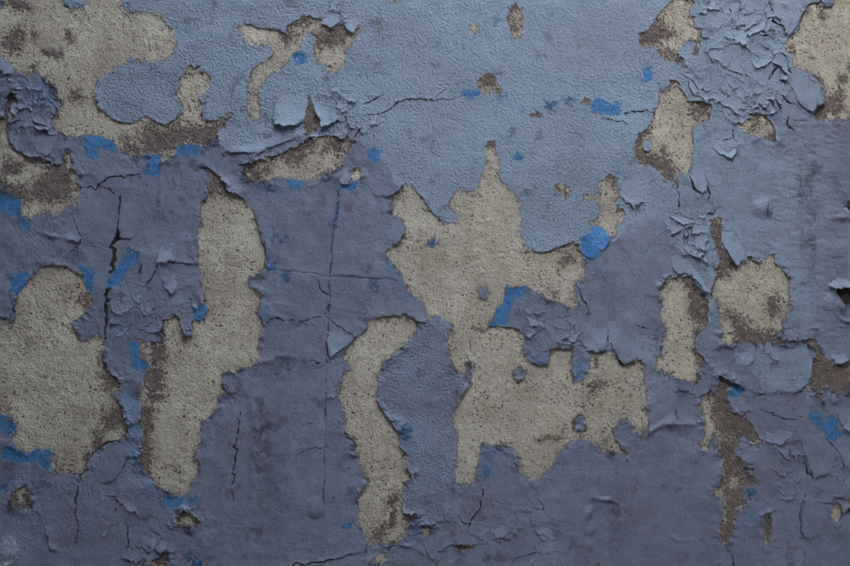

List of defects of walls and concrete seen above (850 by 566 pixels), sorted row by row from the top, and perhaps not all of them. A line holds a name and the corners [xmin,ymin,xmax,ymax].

peeling [0,0,234,231]
peeling [221,0,386,228]
crack [354,89,463,138]
peeling [0,264,130,510]
peeling [100,486,170,566]
peeling [106,166,291,527]
crack [231,410,241,501]
crack [265,190,395,518]
peeling [326,0,850,566]